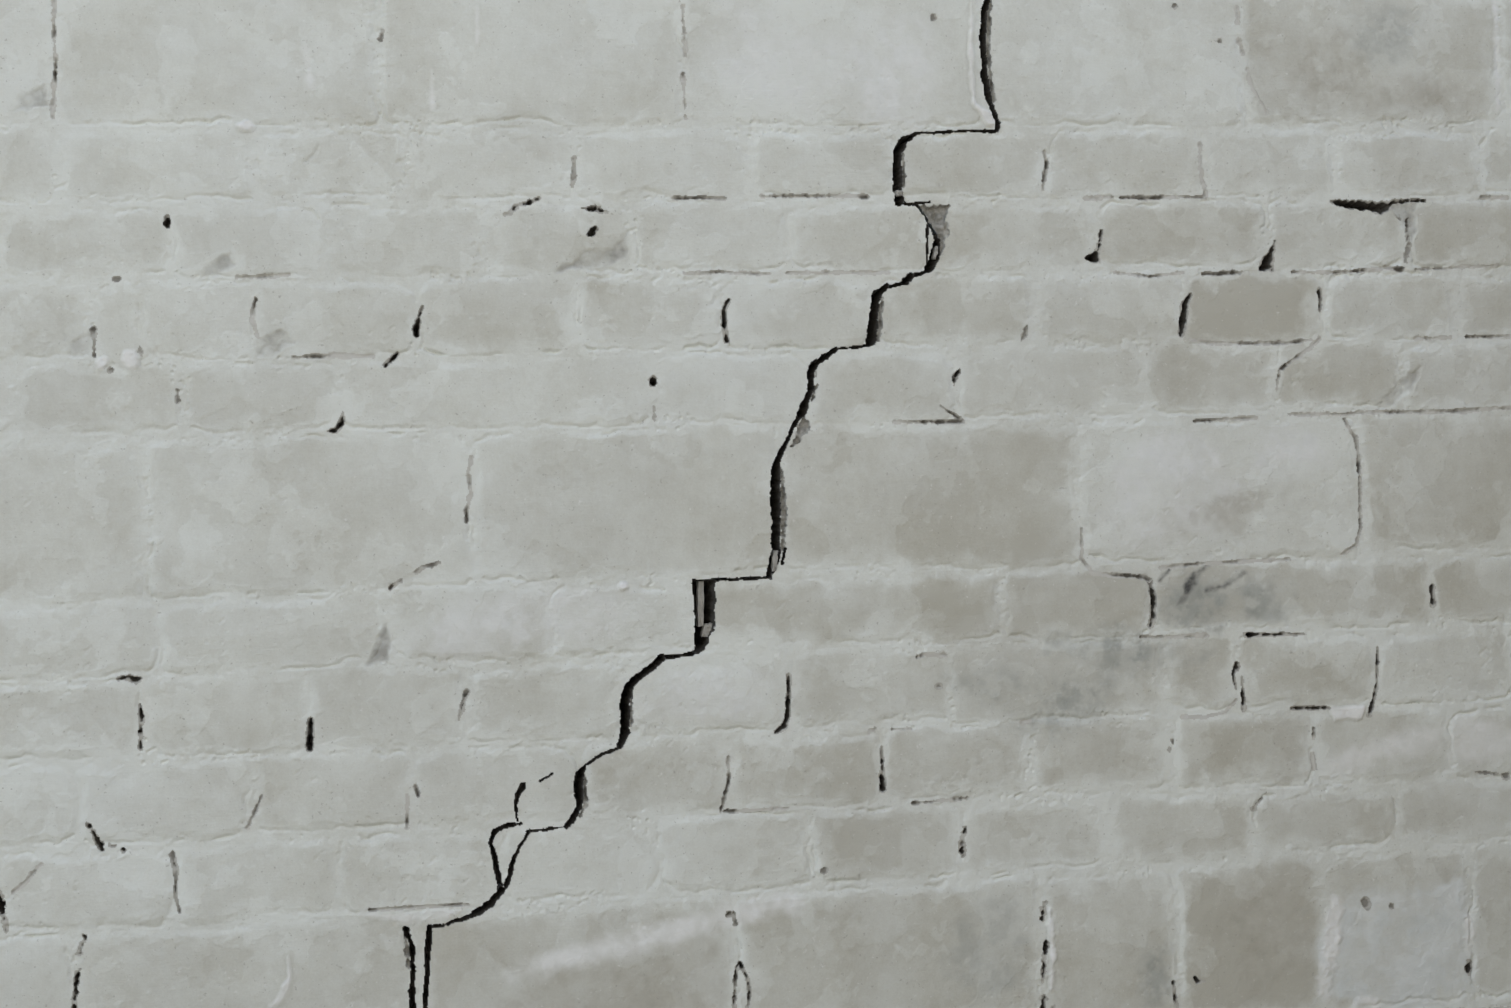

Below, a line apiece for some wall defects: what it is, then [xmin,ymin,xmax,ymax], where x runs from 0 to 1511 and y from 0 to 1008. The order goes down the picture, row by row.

crack [235,273,291,339]
crack [291,351,375,360]
crack [368,0,1001,1008]
crack [244,794,263,830]